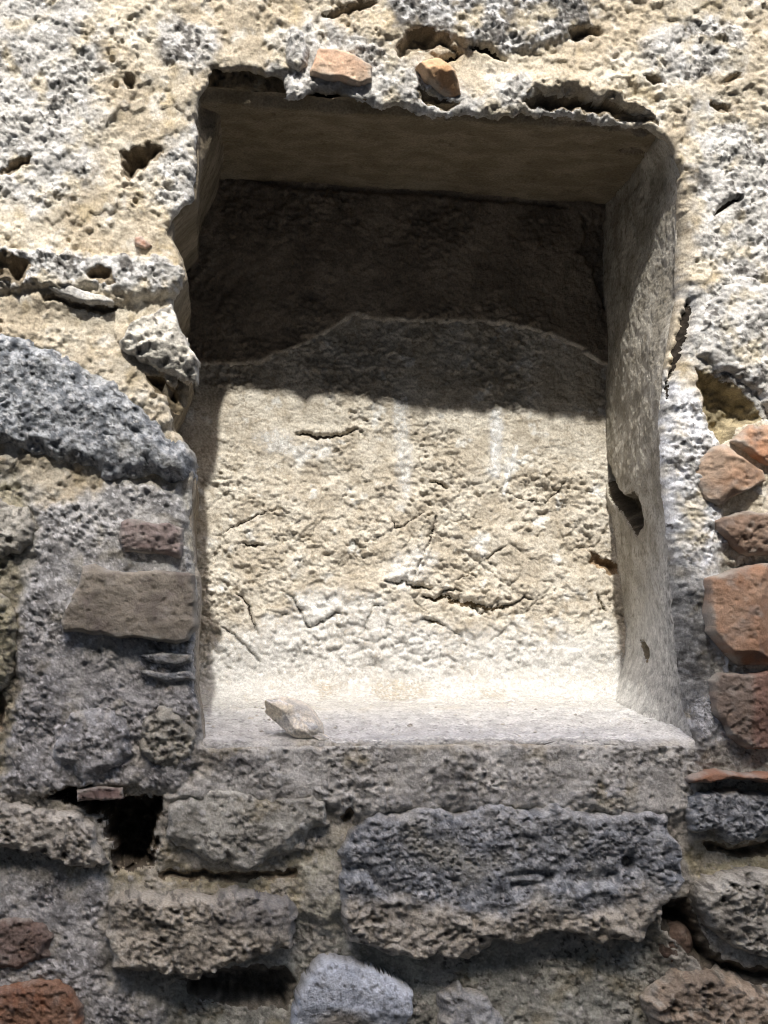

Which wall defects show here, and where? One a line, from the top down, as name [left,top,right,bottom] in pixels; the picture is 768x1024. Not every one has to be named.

crack [664,303,692,400]
crack [299,431,353,440]
crack [226,511,273,548]
crack [387,513,529,640]
crack [228,594,259,661]